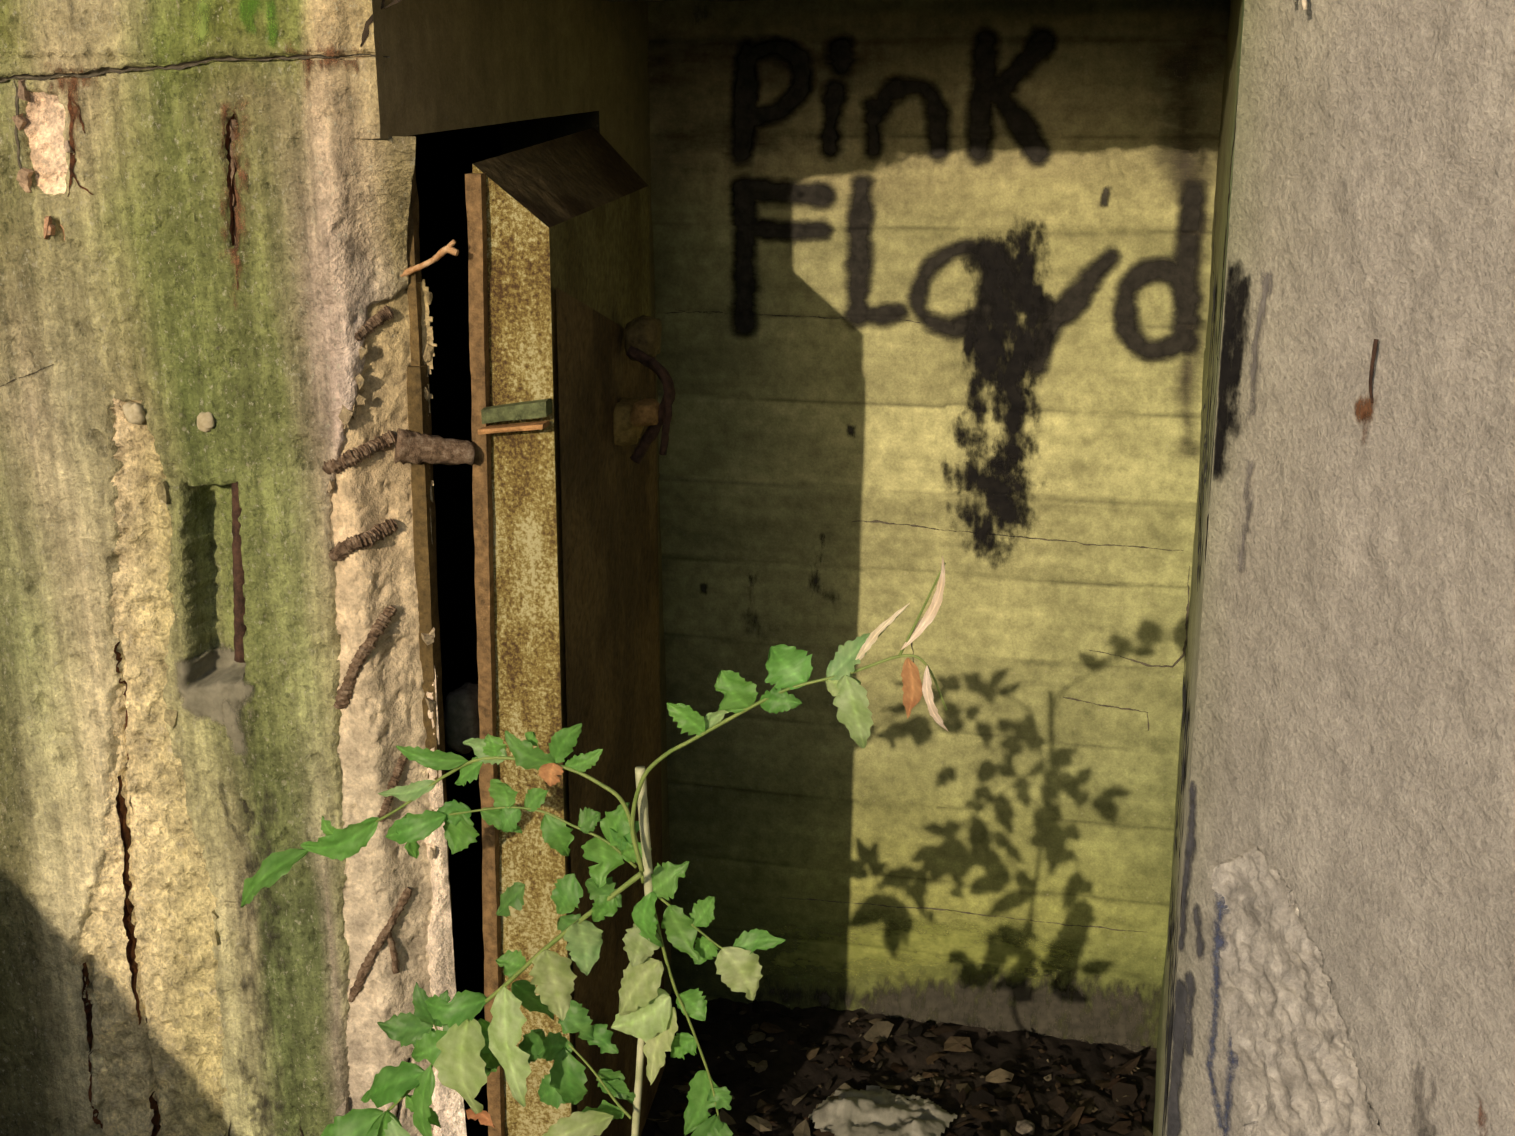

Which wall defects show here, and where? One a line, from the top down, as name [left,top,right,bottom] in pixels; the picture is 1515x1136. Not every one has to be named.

spalling [12,79,74,195]
spalling [43,216,65,240]
rust [50,68,90,146]
crack [0,0,402,197]
rust [220,103,248,307]
crack [114,642,147,1025]
crack [82,962,103,1129]
crack [149,1091,161,1136]